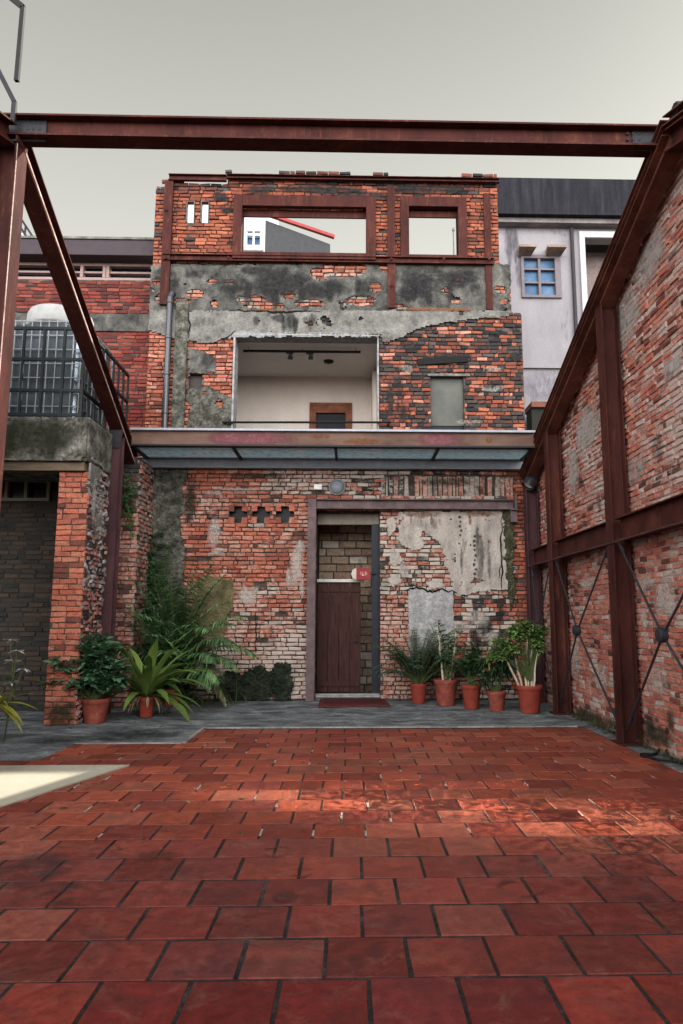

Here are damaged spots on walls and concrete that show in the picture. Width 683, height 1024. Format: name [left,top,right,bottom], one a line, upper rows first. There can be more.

spalling [174,278,233,304]
spalling [236,291,325,310]
damp [271,289,315,332]
spalling [310,263,382,307]
peeling [227,330,380,341]
flaking render [185,347,232,428]
flaking render [386,510,508,596]